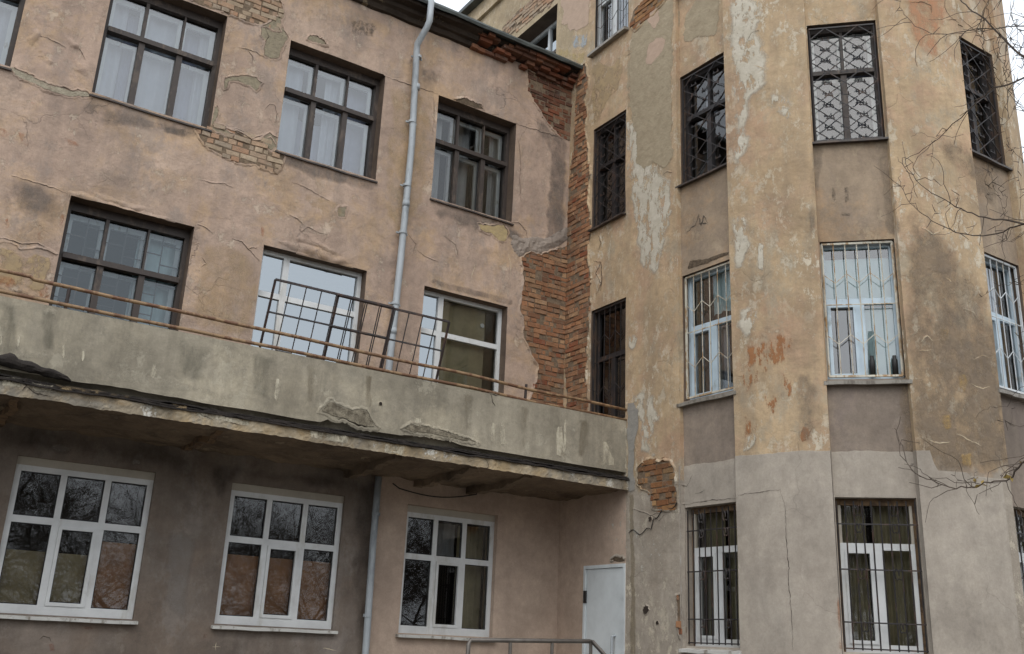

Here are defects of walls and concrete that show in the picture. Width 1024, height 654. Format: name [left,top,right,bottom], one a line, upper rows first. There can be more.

flaking render [190,0,290,62]
flaking render [9,65,94,100]
peeling [730,0,766,161]
flaking render [192,104,287,175]
flaking render [469,0,592,410]
peeling [626,122,671,272]
peeling [197,412,249,425]
spalling [311,397,381,443]
spalling [400,421,481,448]
flaking render [635,392,679,513]
crack [631,476,793,647]